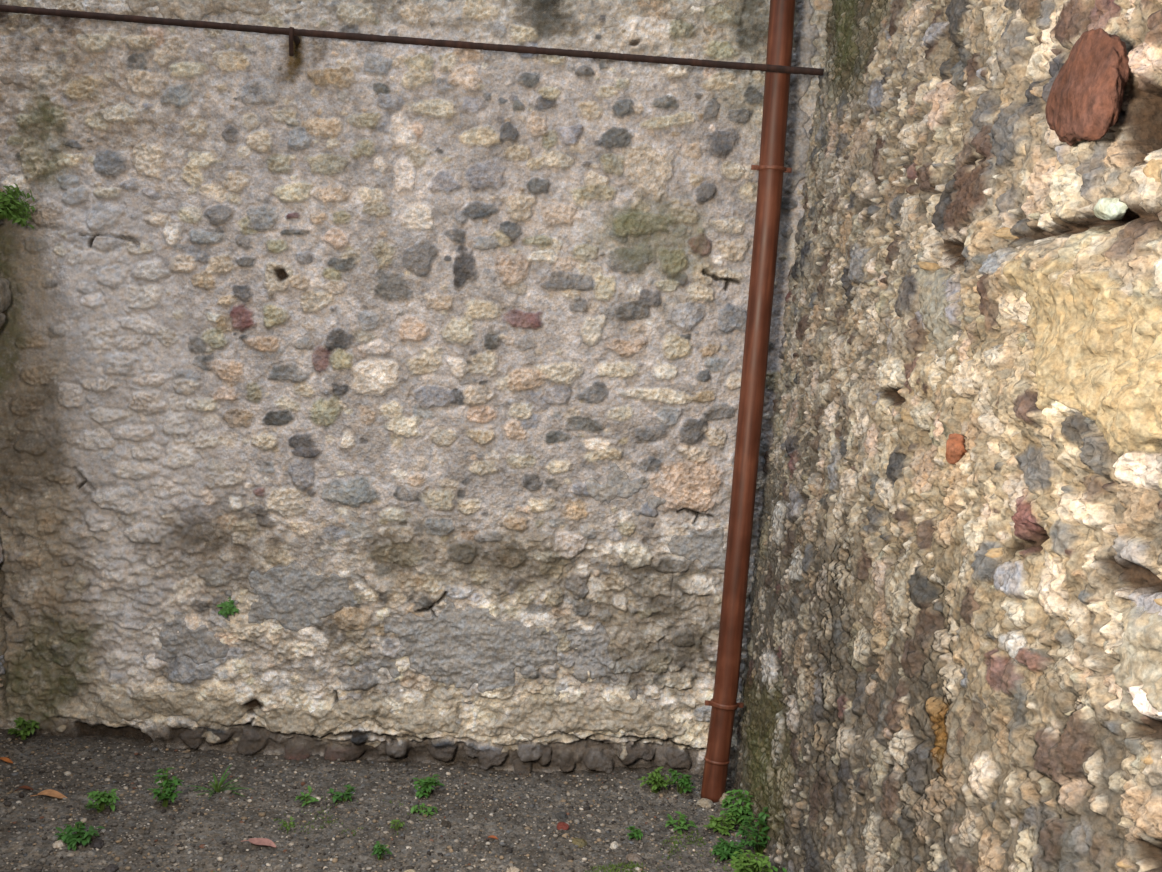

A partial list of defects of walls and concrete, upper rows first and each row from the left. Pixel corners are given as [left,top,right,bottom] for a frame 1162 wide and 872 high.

crack [81,234,140,248]
crack [702,271,739,290]
crack [677,508,712,522]
crack [419,591,447,617]